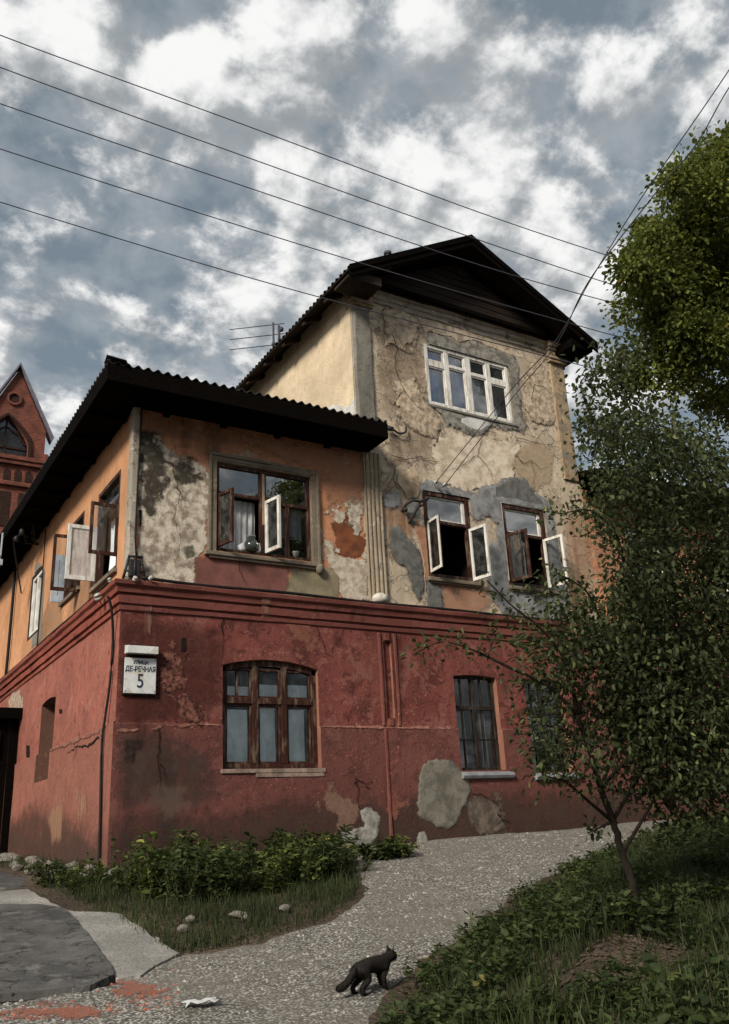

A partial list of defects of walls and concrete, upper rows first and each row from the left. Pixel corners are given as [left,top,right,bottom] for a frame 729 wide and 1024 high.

crack [392,333,428,414]
crack [427,331,552,407]
crack [392,441,492,485]
crack [516,438,558,480]
peeling [136,435,208,584]
peeling [242,435,370,601]
peeling [412,518,429,588]
peeling [441,585,490,611]
spalling [466,792,507,836]